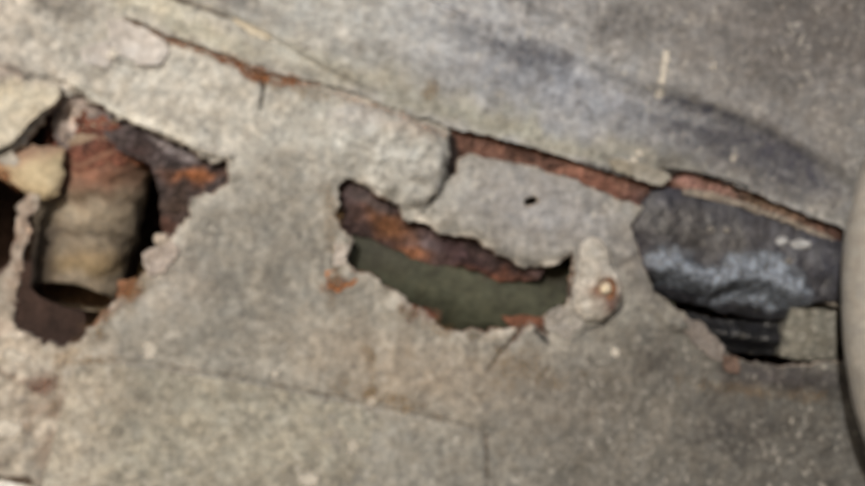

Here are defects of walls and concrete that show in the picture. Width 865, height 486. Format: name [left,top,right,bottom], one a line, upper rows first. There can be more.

crack [175,0,227,18]
rust [151,31,310,86]
crack [258,81,266,110]
crack [430,134,458,205]
peeling [0,63,229,349]
spalling [325,178,584,341]
rust [601,277,617,300]
spalling [630,210,846,374]